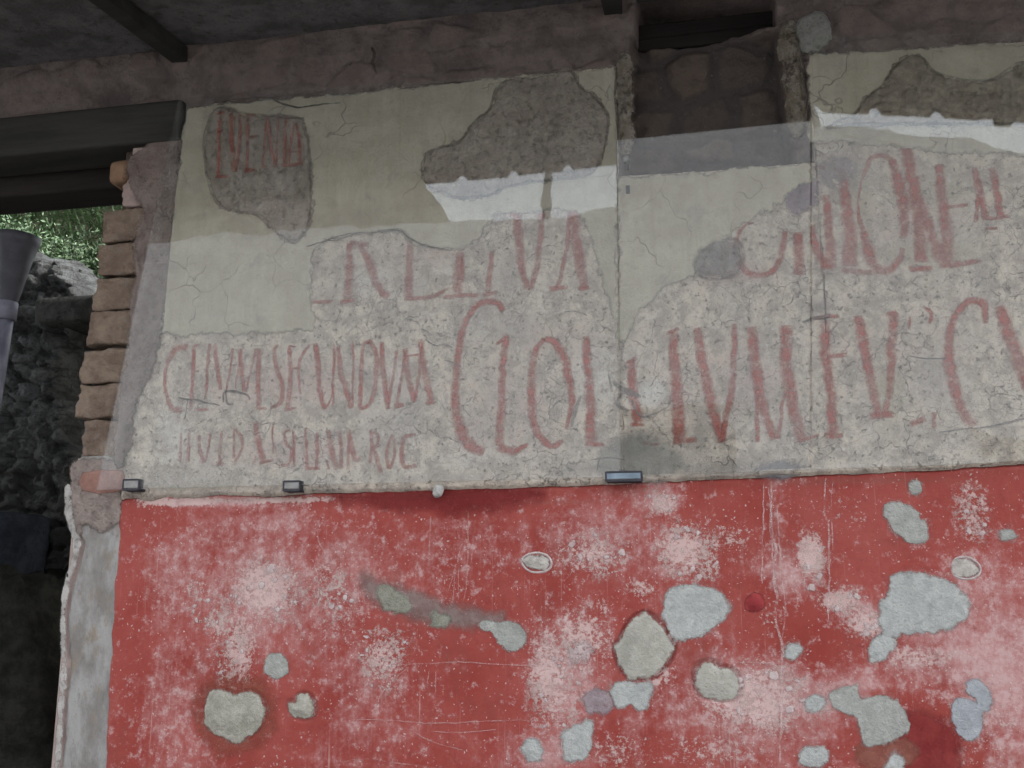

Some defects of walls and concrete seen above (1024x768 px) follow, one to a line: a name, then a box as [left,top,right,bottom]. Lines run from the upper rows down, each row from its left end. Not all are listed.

spalling [204,106,315,243]
spalling [421,68,610,201]
spalling [827,54,1024,129]
damp [582,688,614,715]